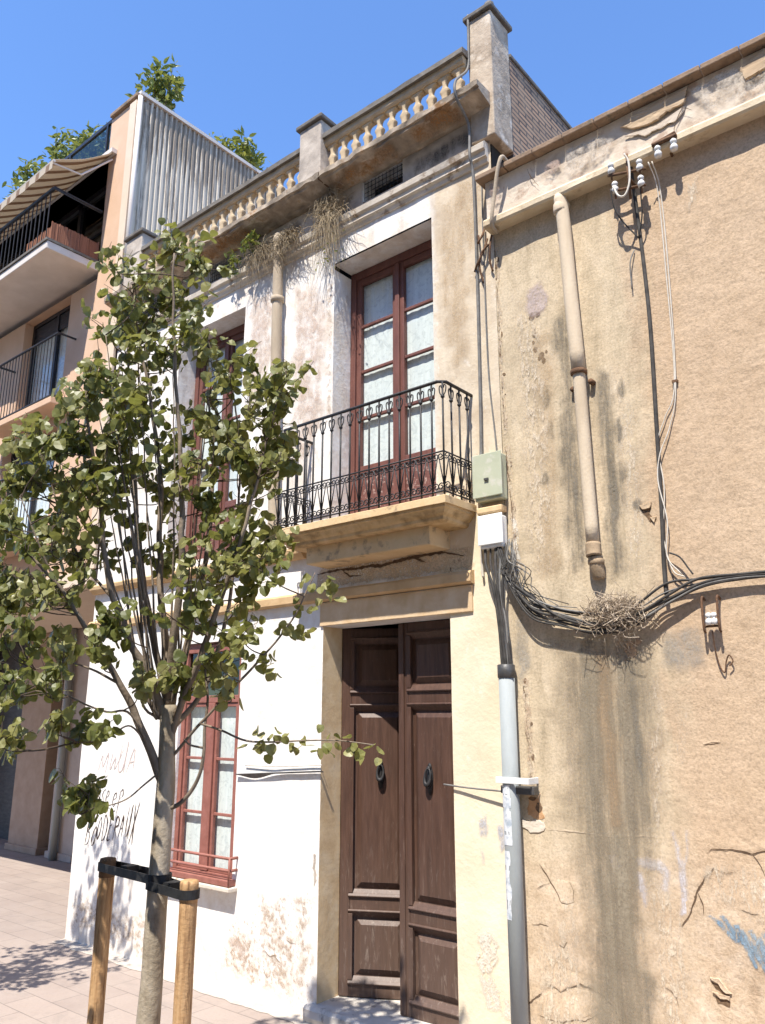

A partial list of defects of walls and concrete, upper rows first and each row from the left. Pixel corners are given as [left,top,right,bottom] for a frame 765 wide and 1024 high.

peeling [620,49,765,137]
peeling [546,138,612,173]
leakage [511,284,584,577]
leakage [598,373,643,572]
crack [317,551,464,577]
spalling [522,678,545,819]
leakage [540,642,687,1024]
crack [537,862,574,904]
crack [677,835,765,926]
spalling [710,977,732,1007]